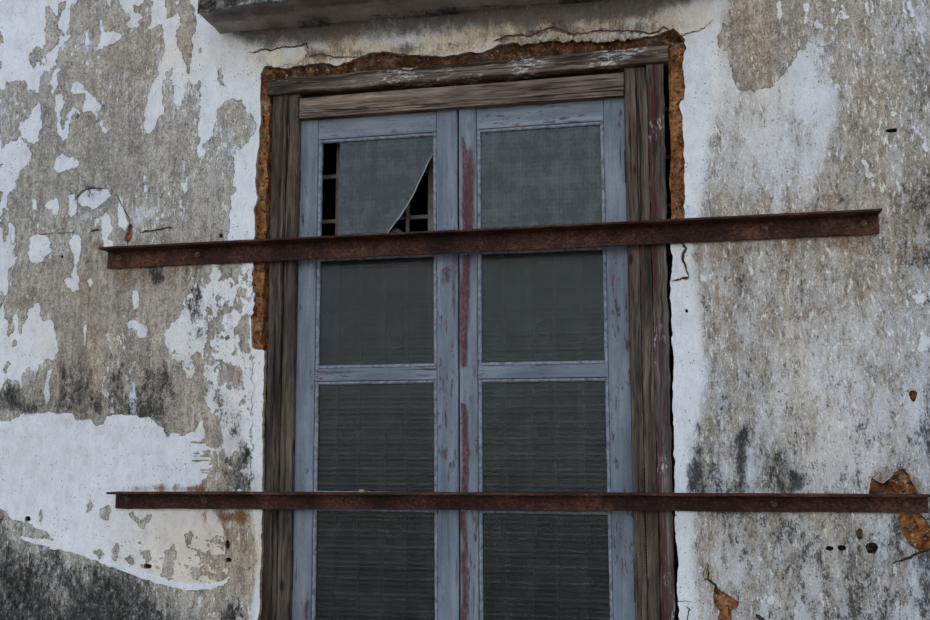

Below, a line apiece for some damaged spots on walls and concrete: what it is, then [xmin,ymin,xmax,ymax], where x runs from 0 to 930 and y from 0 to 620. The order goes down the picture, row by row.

crack [250,42,358,60]
crack [494,19,713,41]
peeling [717,0,880,93]
peeling [0,0,686,492]
spalling [869,469,917,494]
peeling [86,500,112,520]
spalling [899,513,930,551]
leakage [0,513,174,620]
peeling [93,542,152,568]
peeling [160,544,177,581]
leakage [221,596,246,620]
spalling [713,586,739,620]